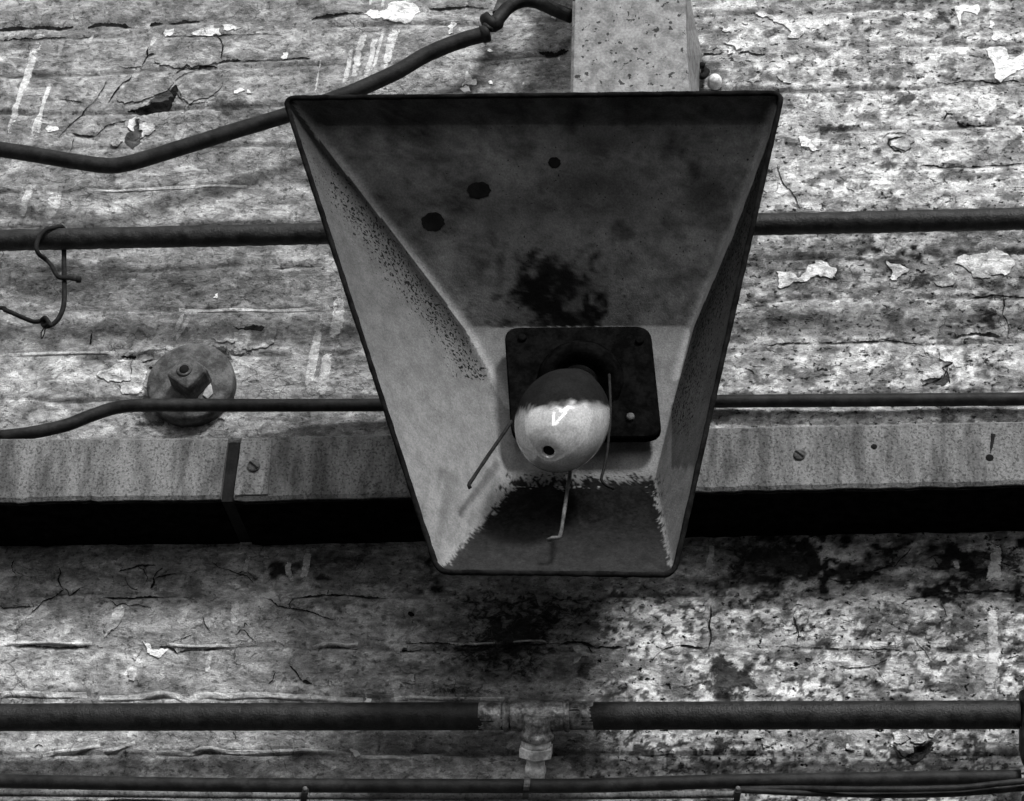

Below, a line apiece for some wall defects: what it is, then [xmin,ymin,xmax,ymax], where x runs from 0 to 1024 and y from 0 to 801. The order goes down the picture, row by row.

crack [58,33,310,151]
spalling [111,85,178,149]
peeling [776,260,837,289]
peeling [886,261,910,281]
peeling [935,247,1015,287]
leakage [704,542,813,582]
leakage [953,541,1023,583]
crack [1,564,175,613]
crack [160,617,253,654]
leakage [432,590,601,679]
leakage [967,605,1000,691]
crack [269,666,312,684]